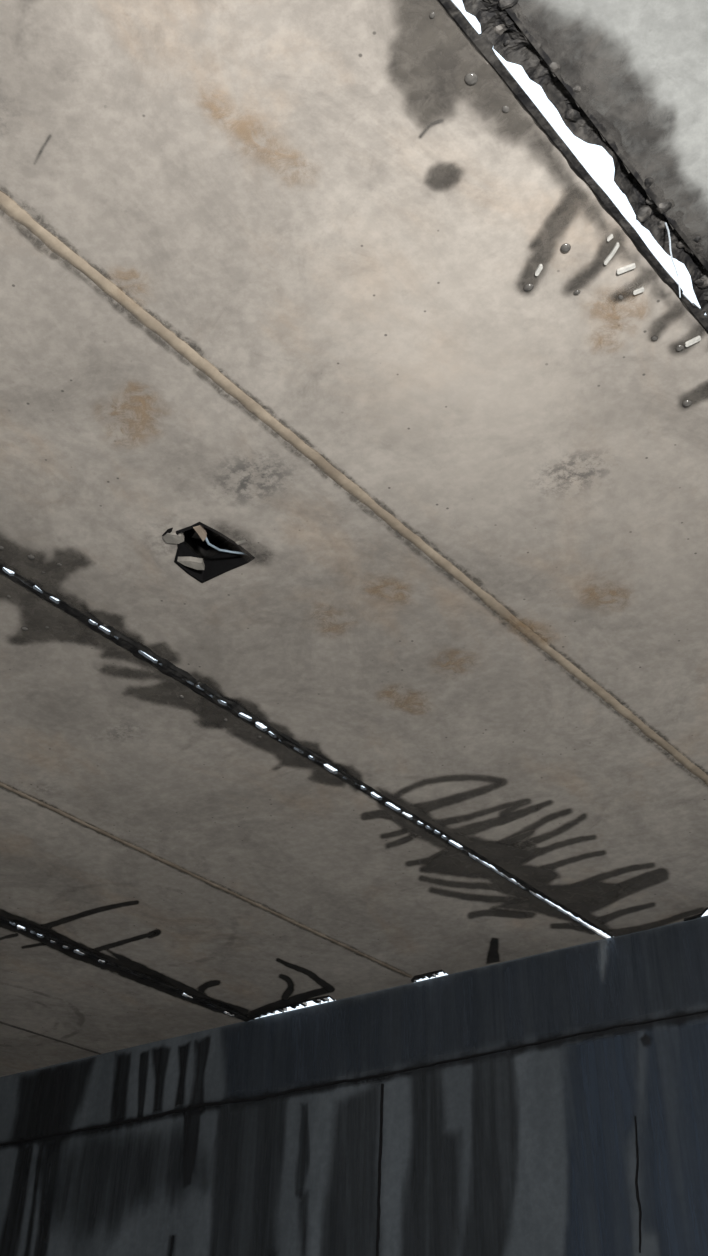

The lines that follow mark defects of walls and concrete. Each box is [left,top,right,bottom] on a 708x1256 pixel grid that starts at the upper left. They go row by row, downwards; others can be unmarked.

water stain [390,0,653,301]
water stain [511,0,708,261]
water stain [651,304,685,341]
water stain [672,324,705,353]
water stain [681,383,708,408]
hole [162,522,270,583]
water stain [0,537,362,790]
spalling [245,995,335,1022]
water stain [0,775,708,1256]